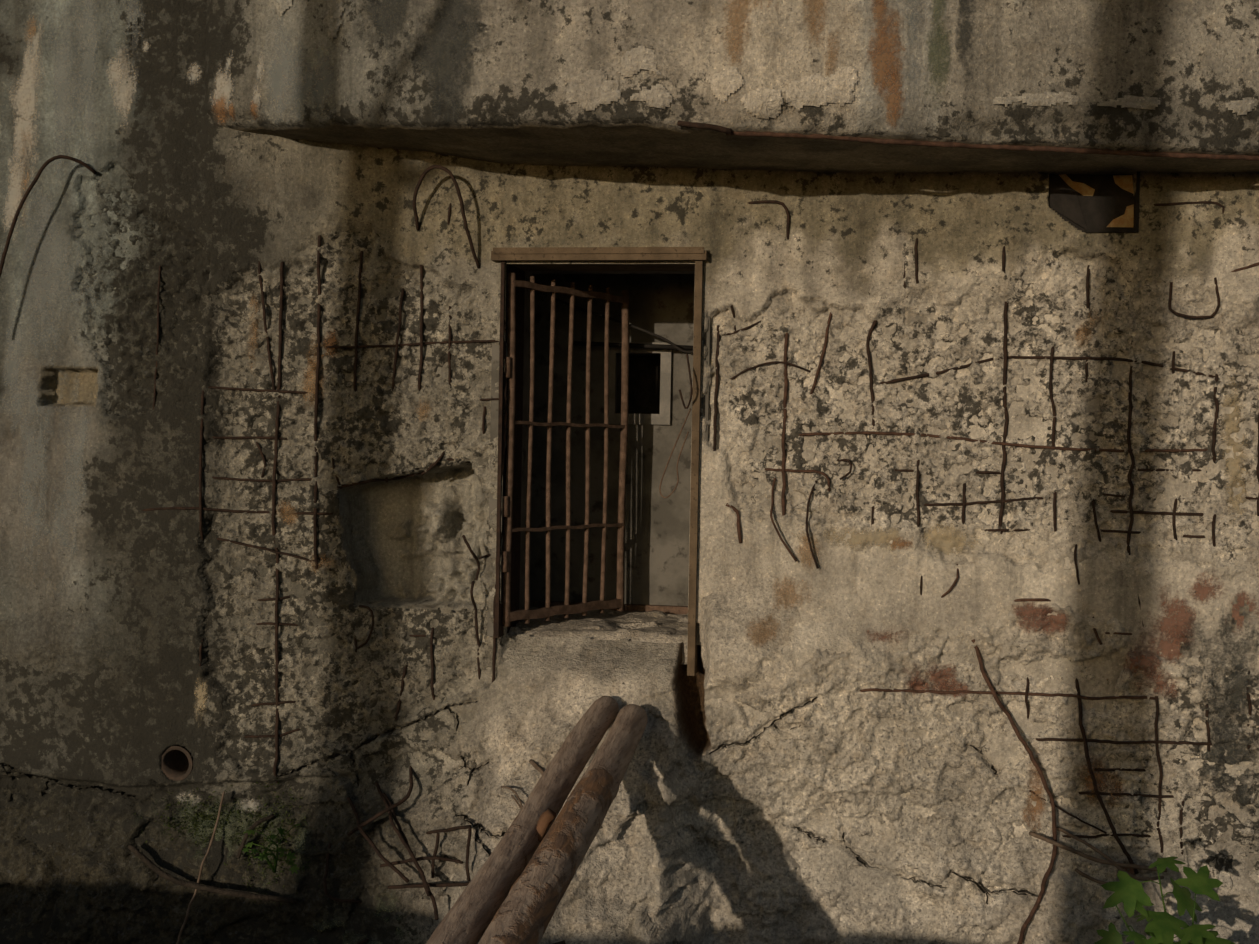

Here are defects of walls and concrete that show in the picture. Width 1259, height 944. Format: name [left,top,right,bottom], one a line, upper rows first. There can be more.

leakage [212,58,233,109]
leakage [414,0,486,128]
flaking render [564,46,672,111]
flaking render [706,66,860,120]
spalling [701,238,1259,598]
spalling [0,155,518,944]
rust [196,683,206,712]
crack [709,697,818,754]
crack [0,764,134,801]
spalling [623,596,1259,944]
crack [969,745,997,775]
crack [794,827,1036,904]